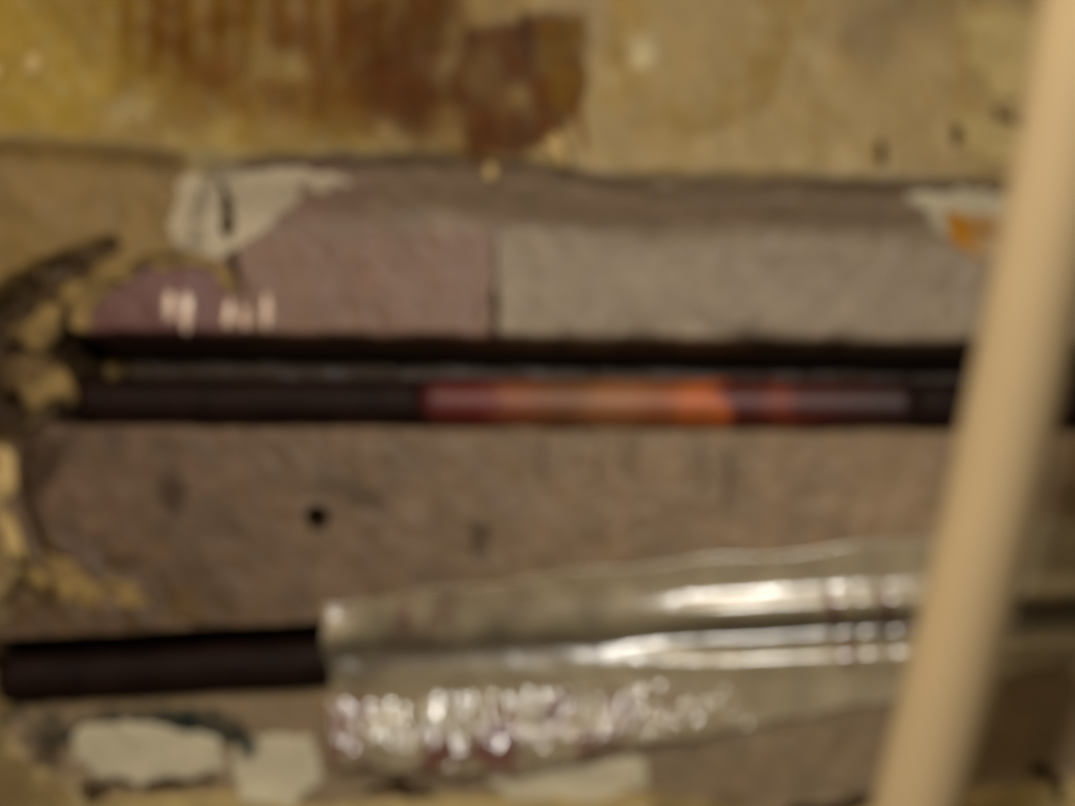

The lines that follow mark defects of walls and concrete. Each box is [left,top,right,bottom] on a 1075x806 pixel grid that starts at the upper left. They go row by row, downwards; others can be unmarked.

spalling [542,132,572,171]
peeling [0,166,353,624]
peeling [73,720,323,806]
peeling [488,755,648,802]